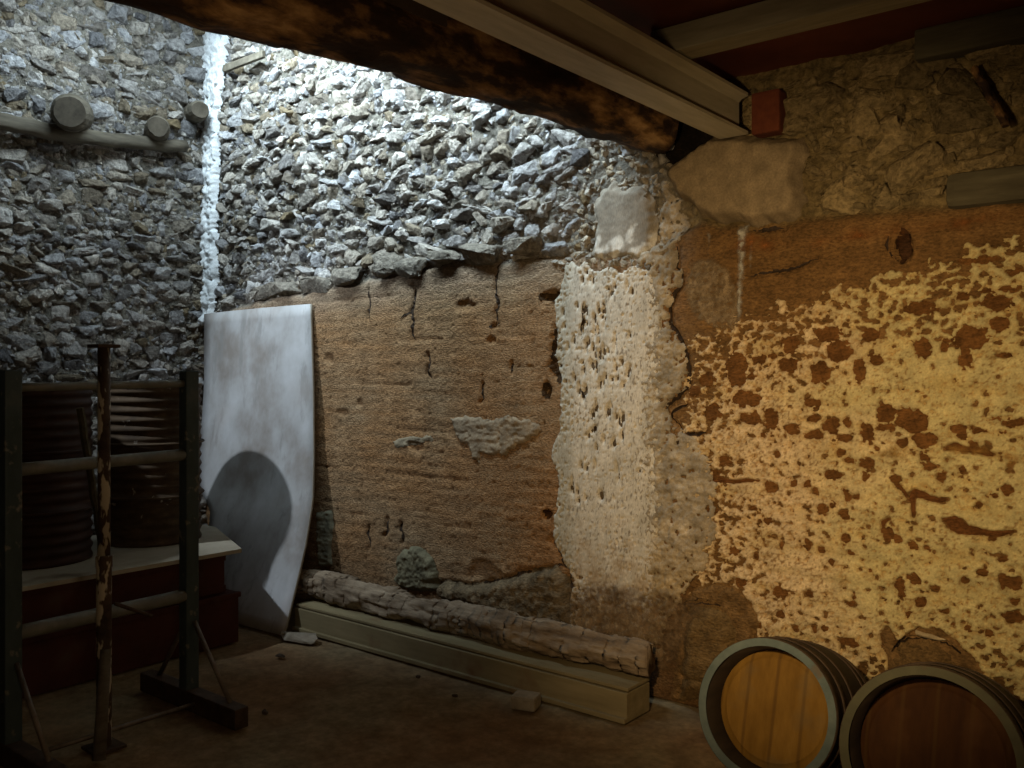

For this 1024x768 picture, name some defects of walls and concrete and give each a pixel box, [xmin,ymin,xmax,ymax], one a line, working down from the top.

crack [401,286,432,378]
crack [489,258,546,328]
damp [687,225,749,329]
crack [748,258,819,278]
flaking render [914,267,1024,370]
flaking render [688,326,1024,520]
flaking render [881,518,931,552]
flaking render [943,516,1014,541]
flaking render [894,572,940,619]
flaking render [961,556,1024,623]
flaking render [671,578,762,703]
flaking render [881,608,995,674]